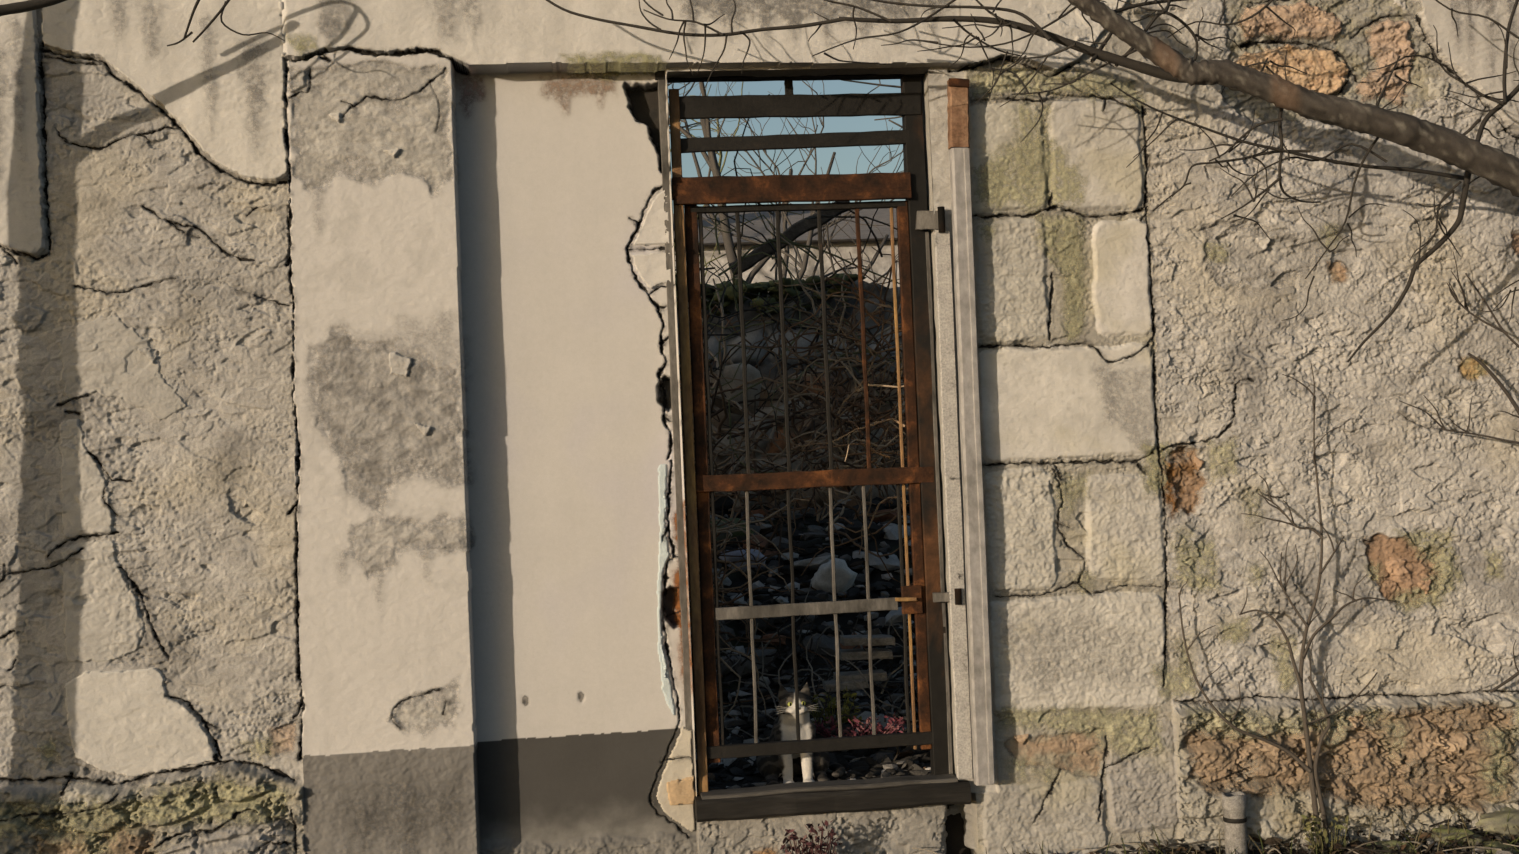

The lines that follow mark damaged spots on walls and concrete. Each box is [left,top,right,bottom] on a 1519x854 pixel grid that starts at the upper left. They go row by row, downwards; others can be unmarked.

spalling [1221,0,1519,133]
spalling [625,83,670,173]
flaking render [632,190,671,289]
crack [948,55,1519,704]
crack [0,42,468,854]
spalling [1166,446,1206,514]
spalling [1365,533,1442,605]
flaking render [656,464,696,831]
spalling [34,827,154,854]
crack [1035,769,1062,822]
crack [1098,736,1150,822]
spalling [1183,702,1519,812]